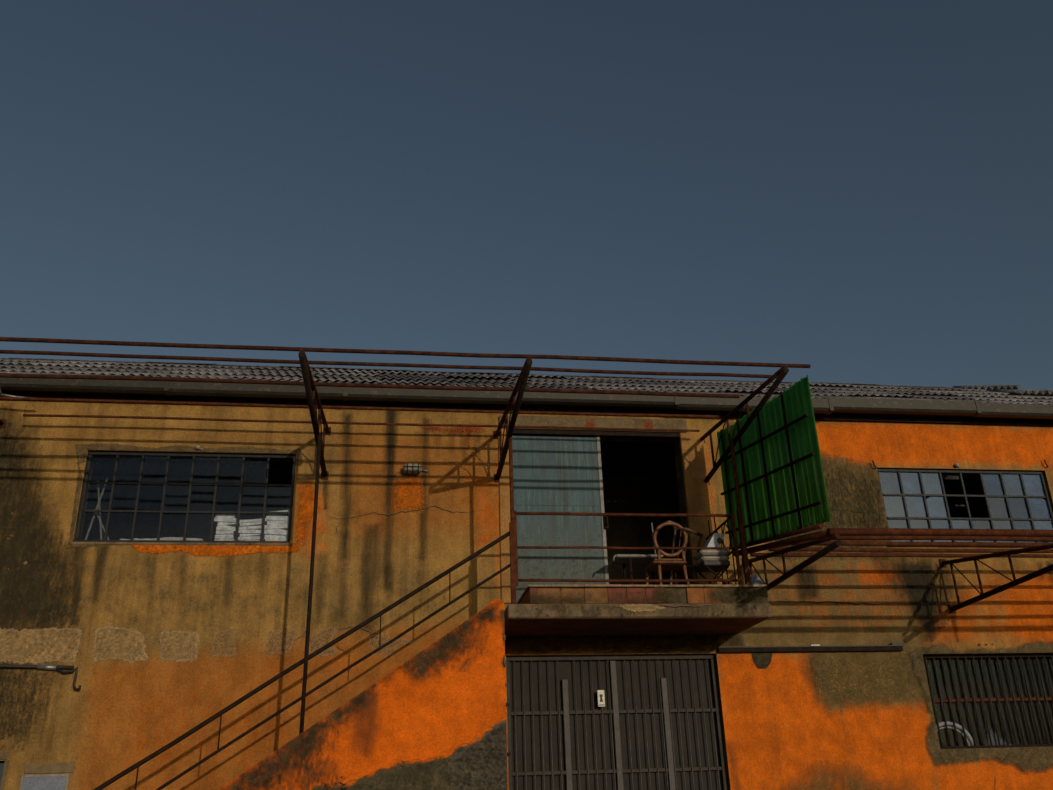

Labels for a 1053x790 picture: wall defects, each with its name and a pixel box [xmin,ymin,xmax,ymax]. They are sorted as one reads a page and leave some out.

damp [0,424,84,629]
peeling [132,484,318,557]
damp [385,410,394,583]
crack [326,500,487,534]
damp [775,462,888,597]
damp [894,560,938,636]
peeling [0,625,200,665]
peeling [309,626,338,657]
peeling [369,633,412,656]
spalling [309,712,508,790]